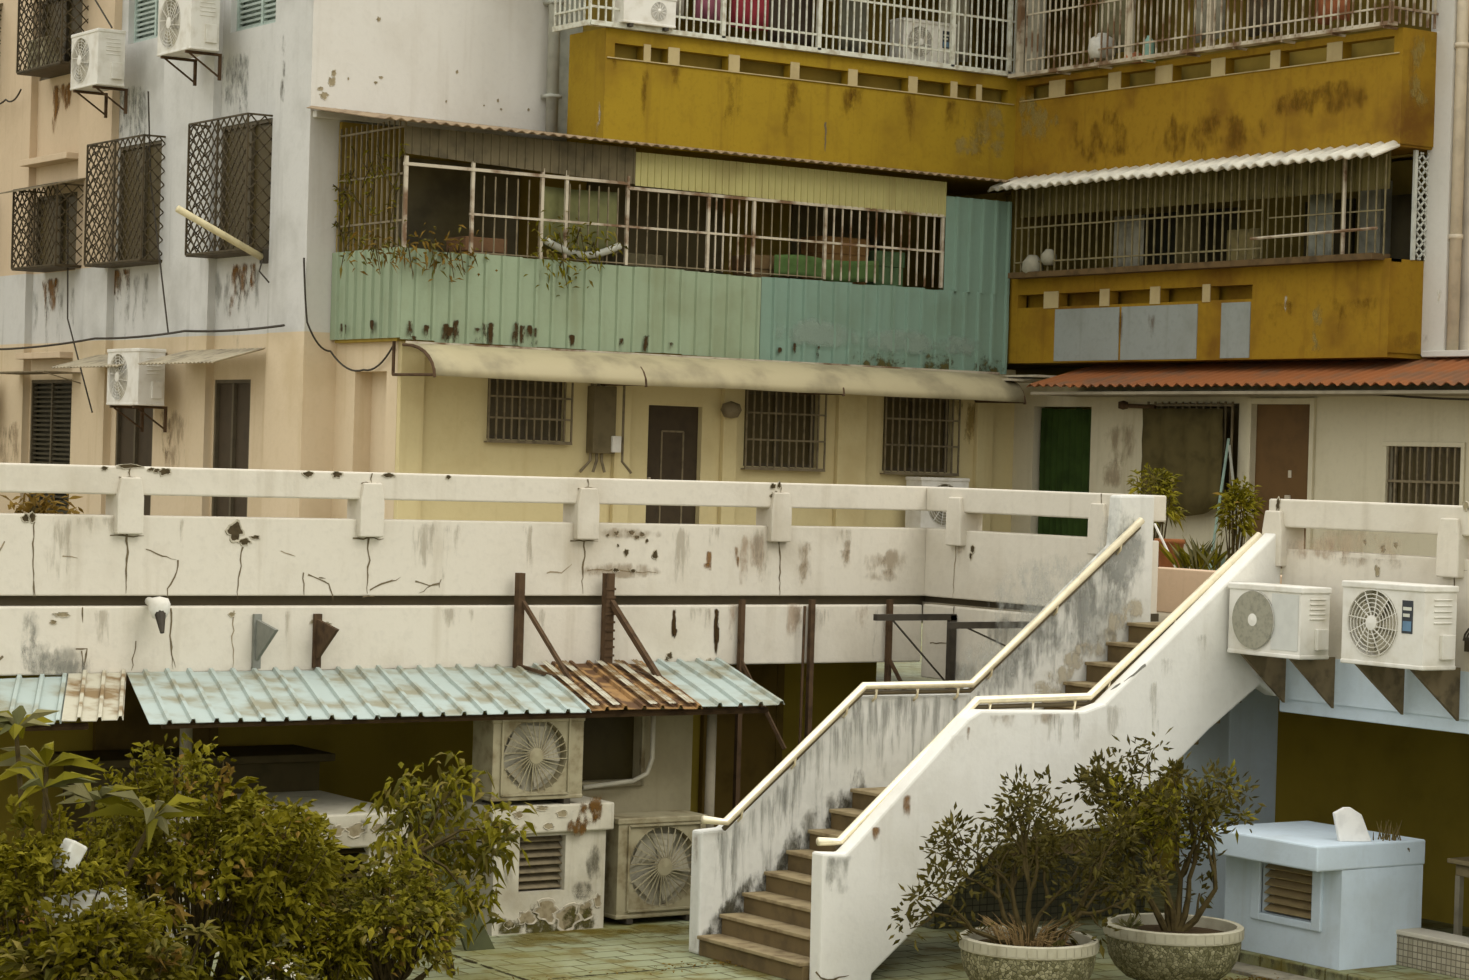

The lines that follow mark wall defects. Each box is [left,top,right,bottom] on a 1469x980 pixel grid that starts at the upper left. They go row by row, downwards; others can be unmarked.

corrosion [42,278,58,309]
corrosion [231,264,255,303]
corrosion [407,320,494,345]
corrosion [512,322,537,345]
spalling [225,519,260,546]
crack [281,537,442,598]
crack [110,534,179,671]
crack [231,547,244,664]
peeling [503,805,568,833]
spalling [503,893,602,931]